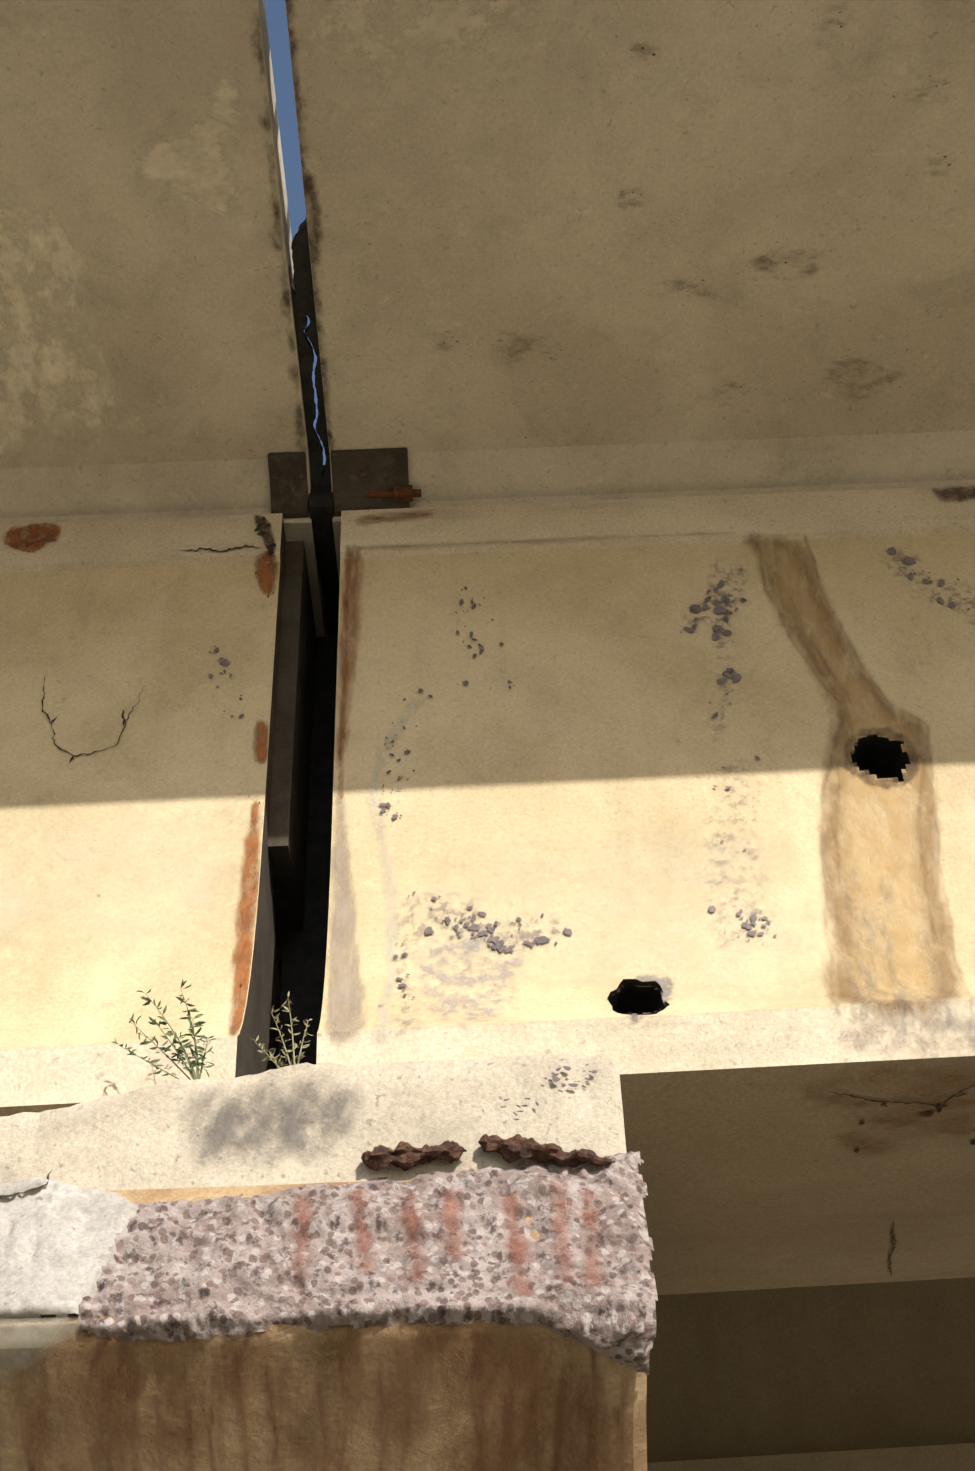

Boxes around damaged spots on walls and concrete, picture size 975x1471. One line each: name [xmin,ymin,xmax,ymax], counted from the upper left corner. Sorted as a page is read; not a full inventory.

corrosion [5,522,60,552]
crack [180,544,261,552]
corrosion [255,551,277,598]
crack [41,677,145,763]
corrosion [255,722,268,762]
leakage [752,540,955,1012]
corrosion [230,796,264,1034]
crack [821,1085,975,1113]
spalling [77,1151,658,1375]
crack [887,1222,898,1276]